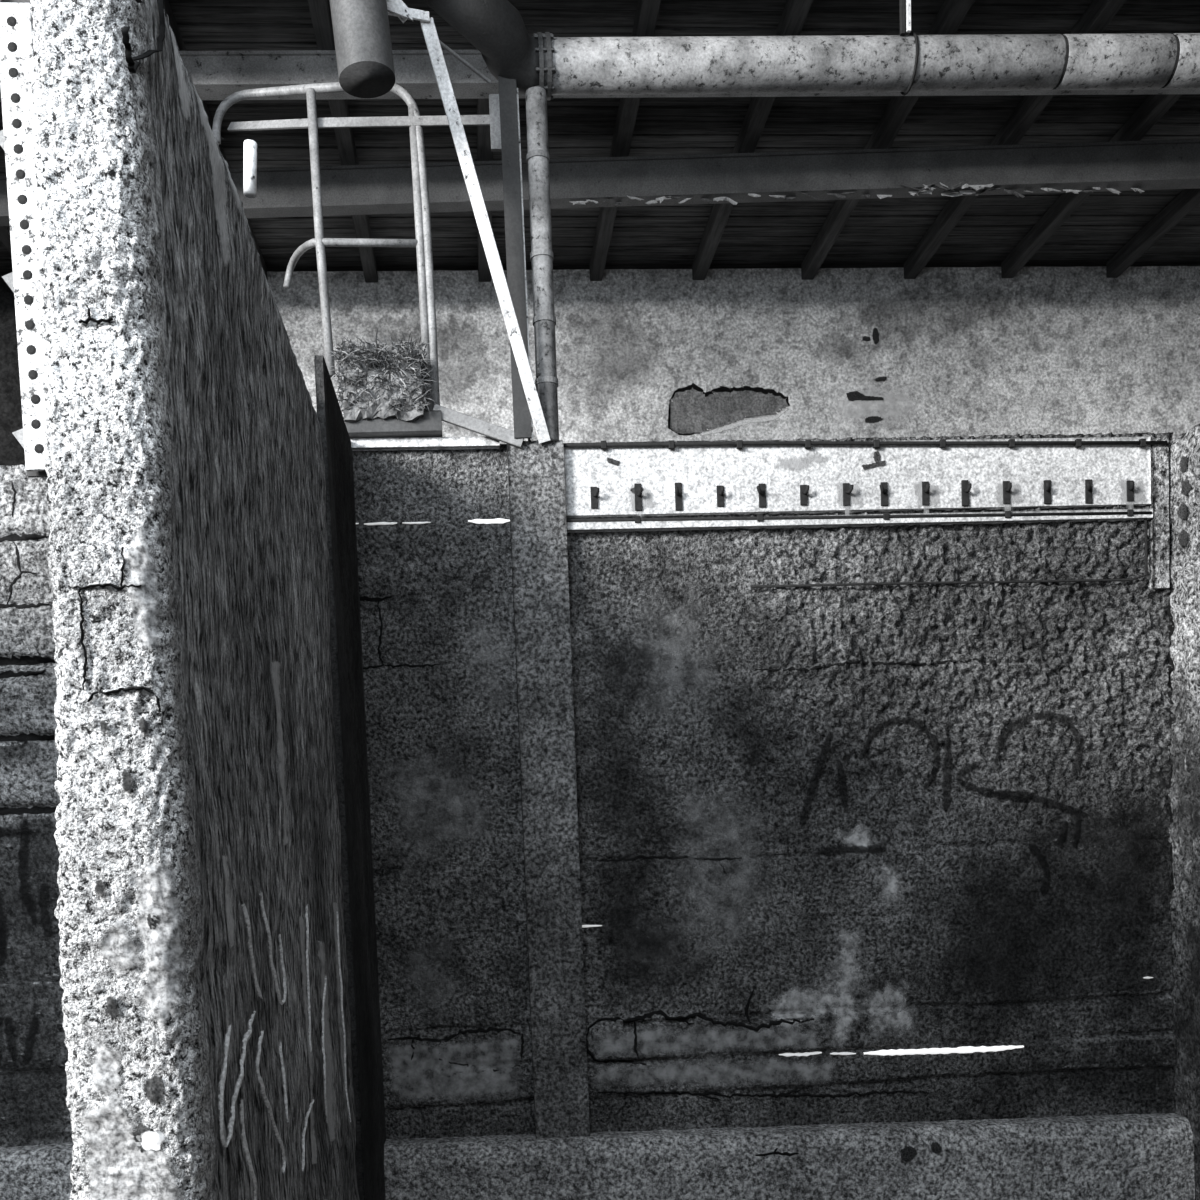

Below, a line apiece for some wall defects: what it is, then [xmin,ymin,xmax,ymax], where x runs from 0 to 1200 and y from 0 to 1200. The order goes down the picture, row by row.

crack [122,0,165,74]
spalling [668,383,790,436]
crack [586,990,930,1101]